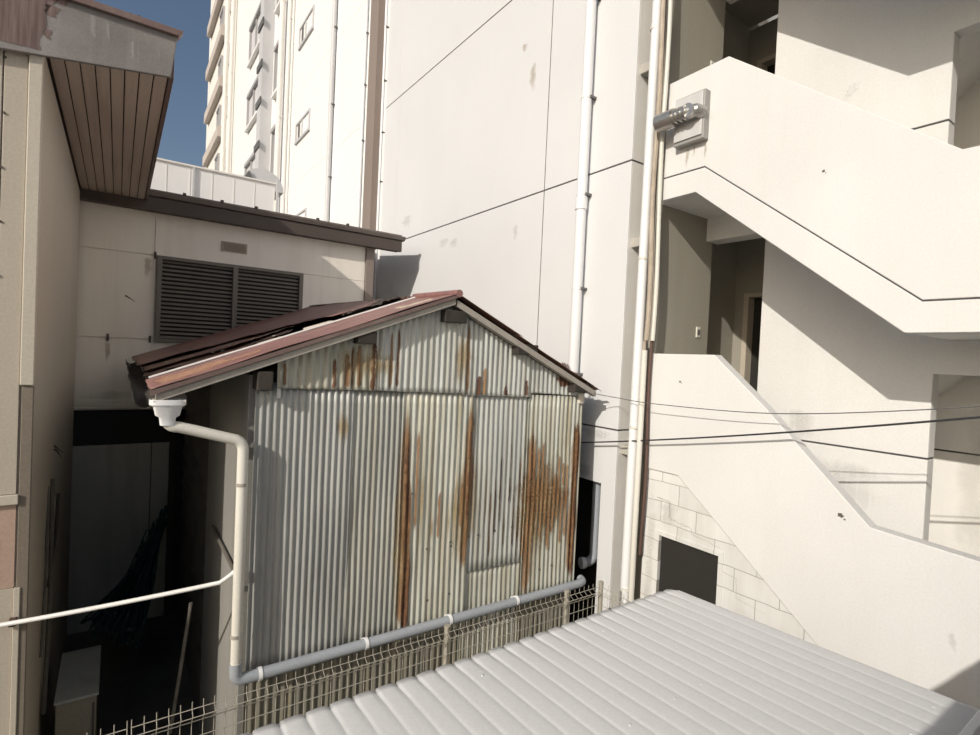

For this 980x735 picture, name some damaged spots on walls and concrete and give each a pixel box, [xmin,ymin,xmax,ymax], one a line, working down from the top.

rust [156,349,261,383]
rust [332,330,400,390]
rust [395,418,423,628]
rust [431,413,580,592]